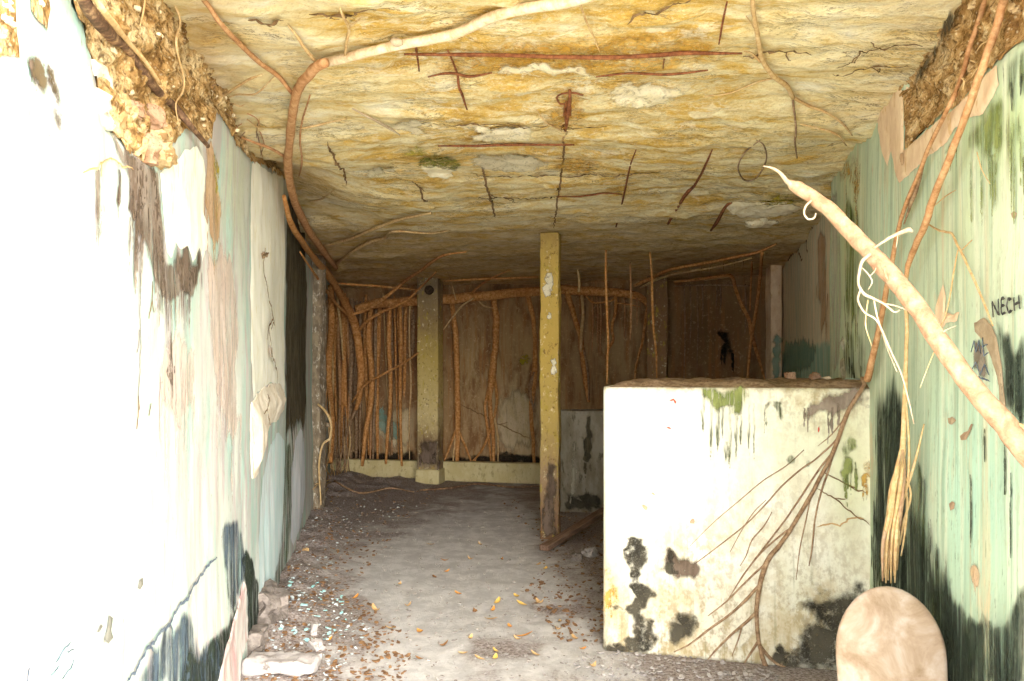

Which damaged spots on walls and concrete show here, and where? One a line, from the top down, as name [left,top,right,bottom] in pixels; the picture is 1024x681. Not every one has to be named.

spalling [73,0,285,262]
crack [327,142,347,185]
rust [438,89,596,174]
crack [449,123,661,228]
rust [404,1,742,110]
crack [834,42,923,77]
spalling [877,0,1024,183]
water stain [113,135,242,501]
water stain [605,537,657,653]
water stain [664,548,700,578]
water stain [670,613,697,645]
water stain [772,385,1024,681]